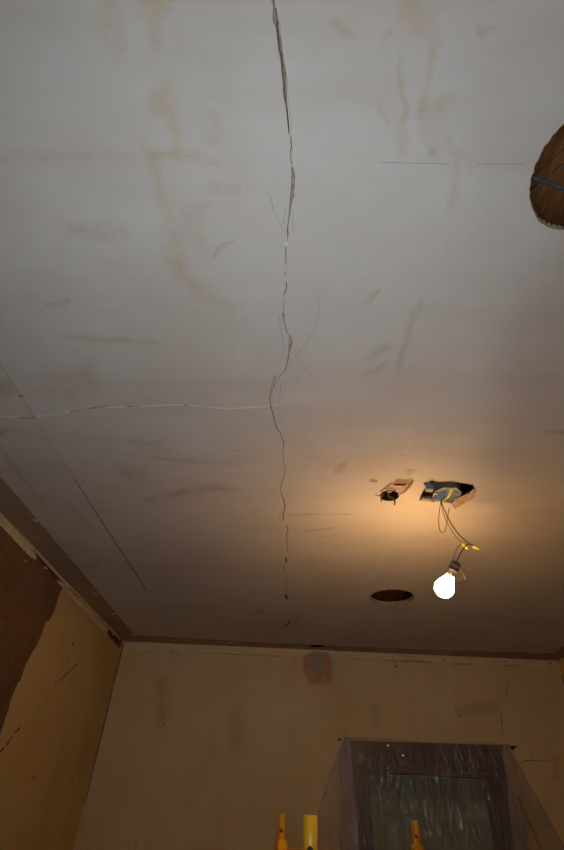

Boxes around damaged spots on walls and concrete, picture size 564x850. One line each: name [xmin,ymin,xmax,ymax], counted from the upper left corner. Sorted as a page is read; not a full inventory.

crack [1,0,319,600]
spalling [369,478,476,509]
peeling [0,517,559,734]